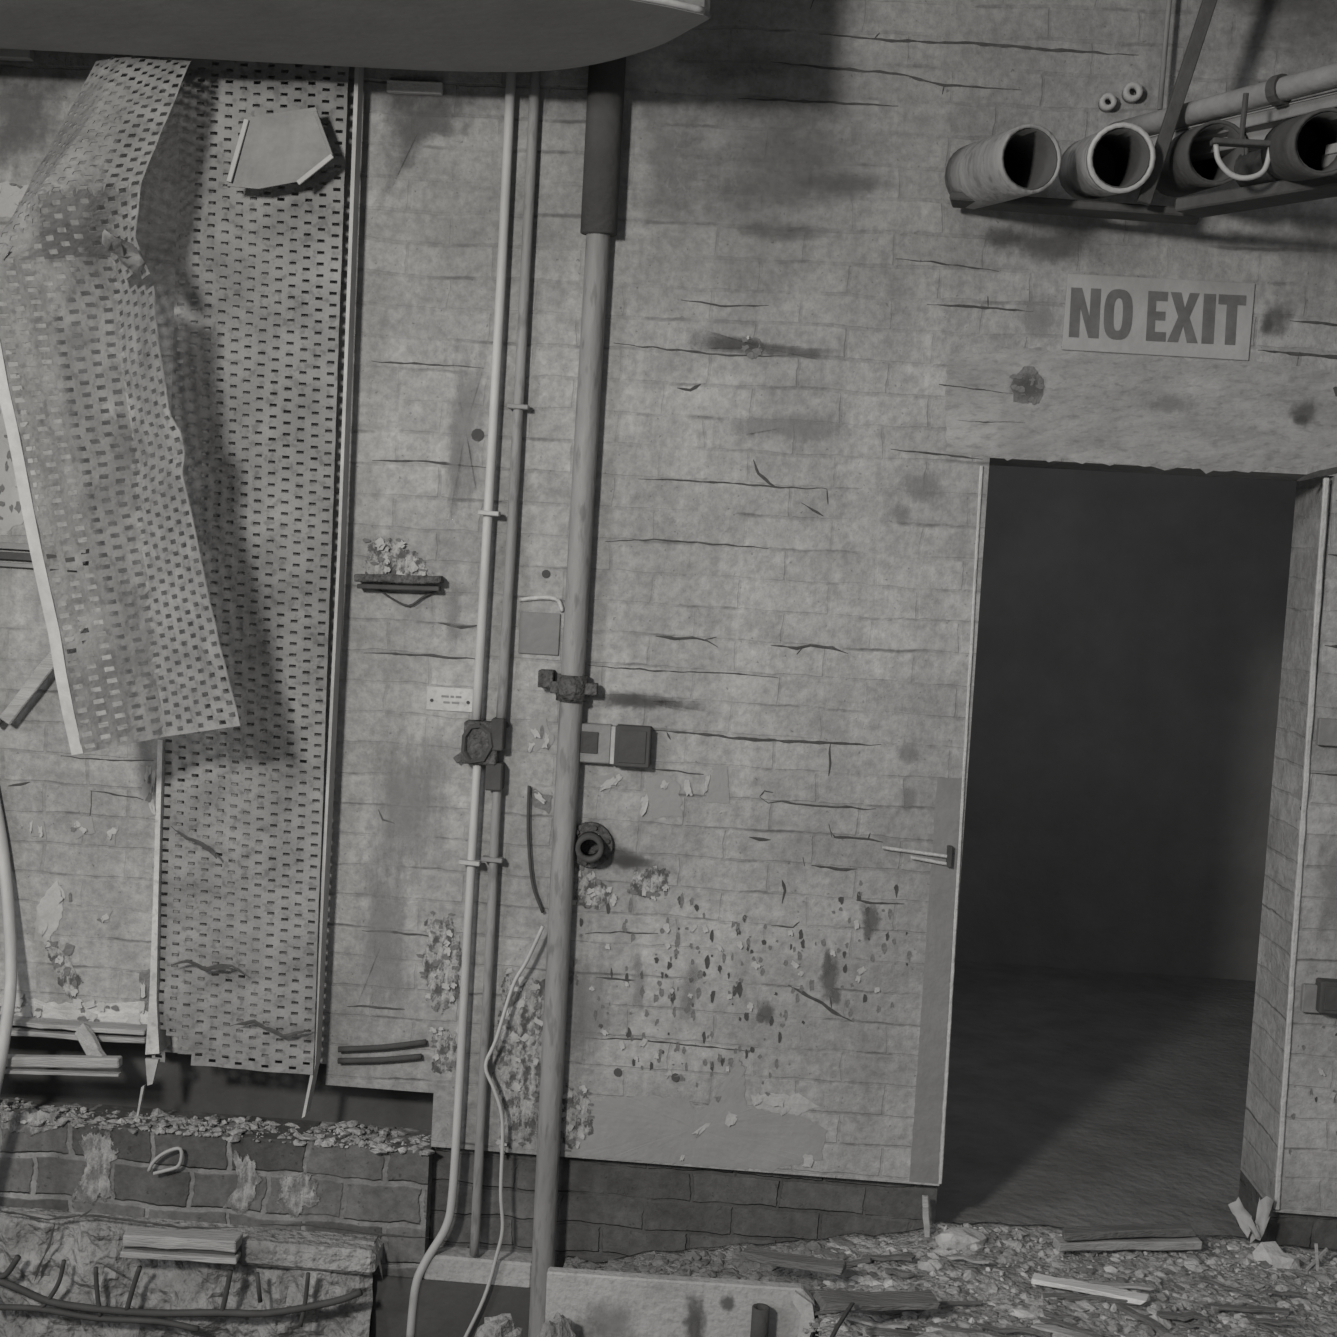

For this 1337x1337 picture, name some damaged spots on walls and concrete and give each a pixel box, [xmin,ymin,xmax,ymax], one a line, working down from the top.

crack [738,0,1133,106]
crack [646,460,828,516]
peeling [0,880,150,1024]
flaking render [416,911,462,1074]
flaking render [492,968,545,1154]
flaking render [561,1083,594,1152]
peeling [570,864,912,1116]
crack [788,985,852,1021]